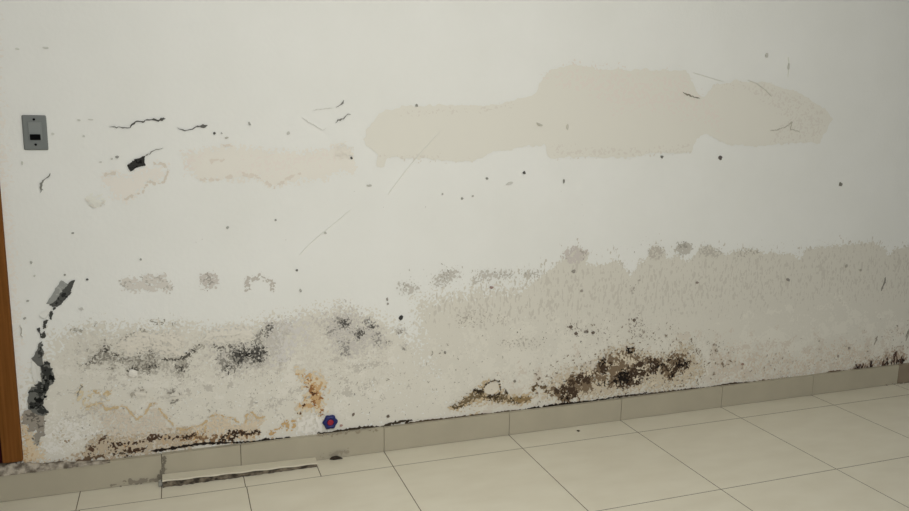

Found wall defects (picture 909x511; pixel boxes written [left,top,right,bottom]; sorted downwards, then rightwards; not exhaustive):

flaking render [127,156,146,171]
crack [112,118,207,131]
peeling [363,59,833,168]
water stain [0,67,909,463]
flaking render [21,274,75,446]
rust [294,366,330,420]